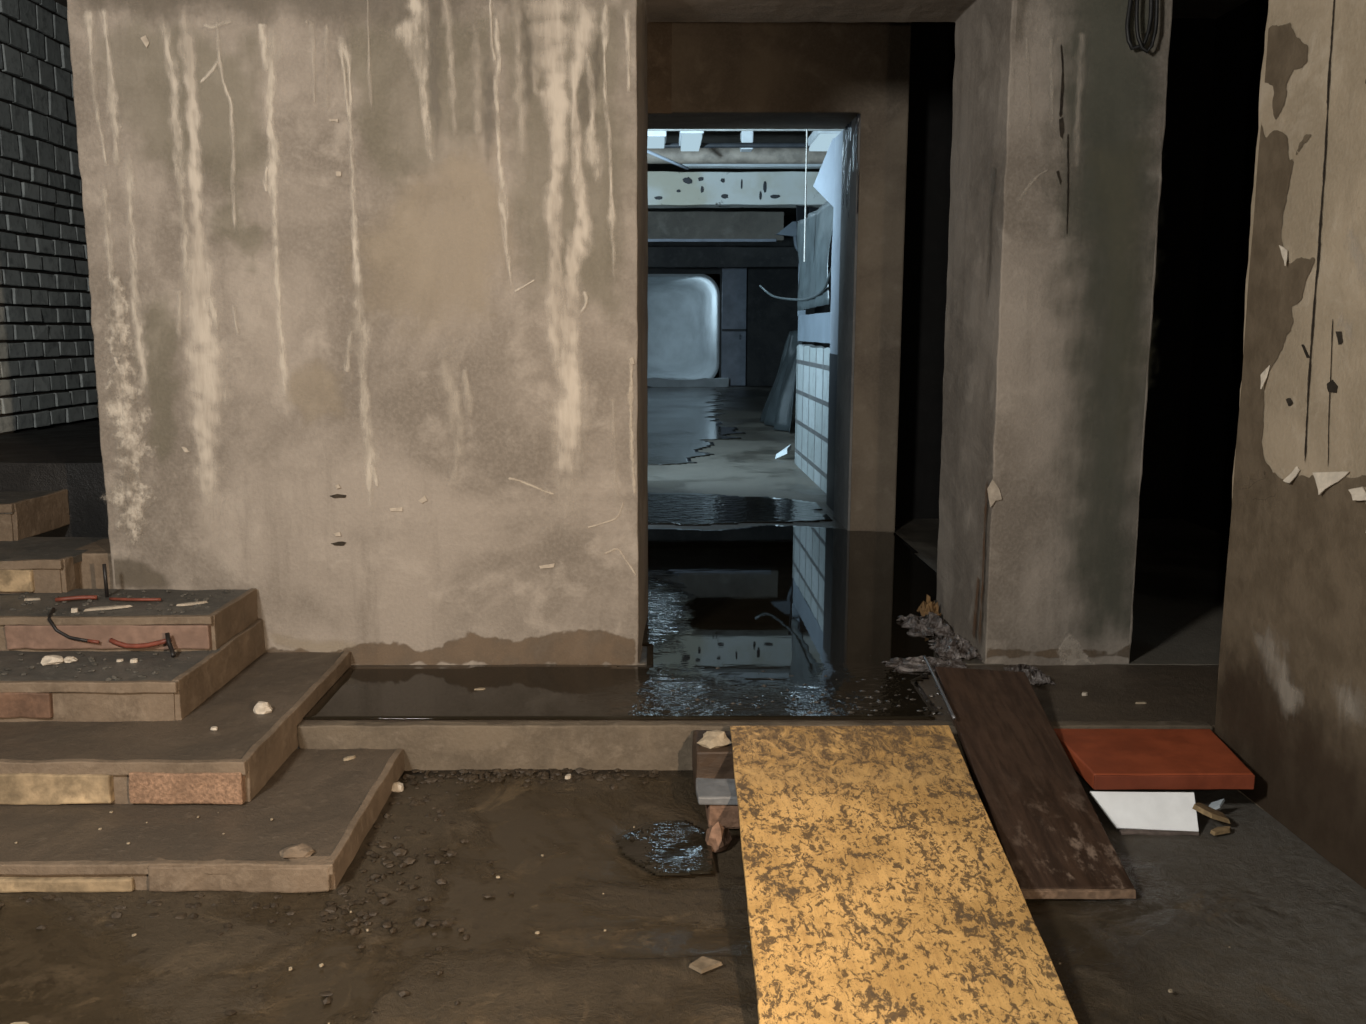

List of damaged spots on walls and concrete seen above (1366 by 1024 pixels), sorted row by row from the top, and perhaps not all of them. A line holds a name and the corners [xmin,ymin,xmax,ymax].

leakage [85,0,152,543]
leakage [162,17,235,501]
leakage [233,0,287,386]
leakage [340,44,378,494]
leakage [397,0,453,156]
leakage [334,630,635,665]
leakage [477,0,510,273]
leakage [515,0,615,470]
peeling [1215,23,1366,838]